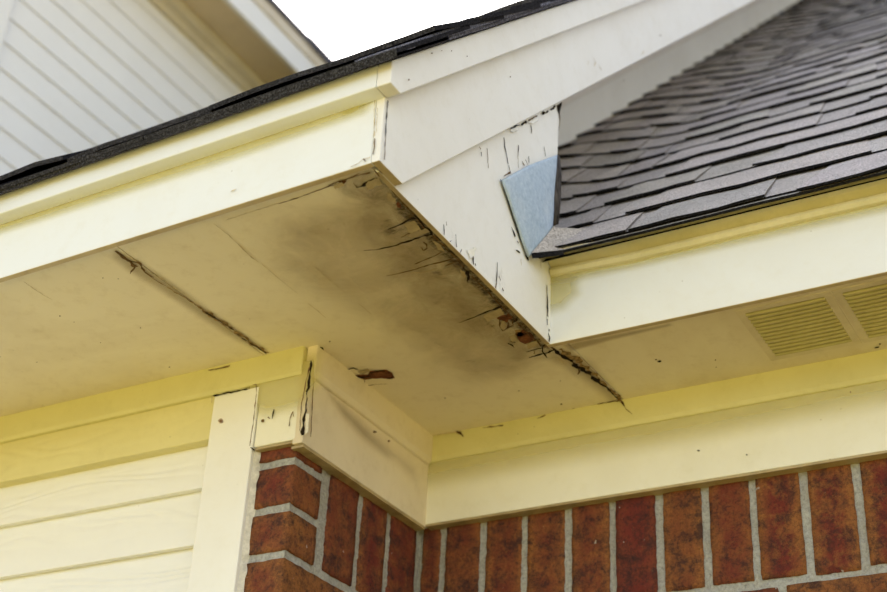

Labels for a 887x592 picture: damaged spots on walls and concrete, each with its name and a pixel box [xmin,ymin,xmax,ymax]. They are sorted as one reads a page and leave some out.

crack [115,251,269,354]
crack [214,100,621,401]
damp [398,199,547,347]
crack [299,347,324,435]